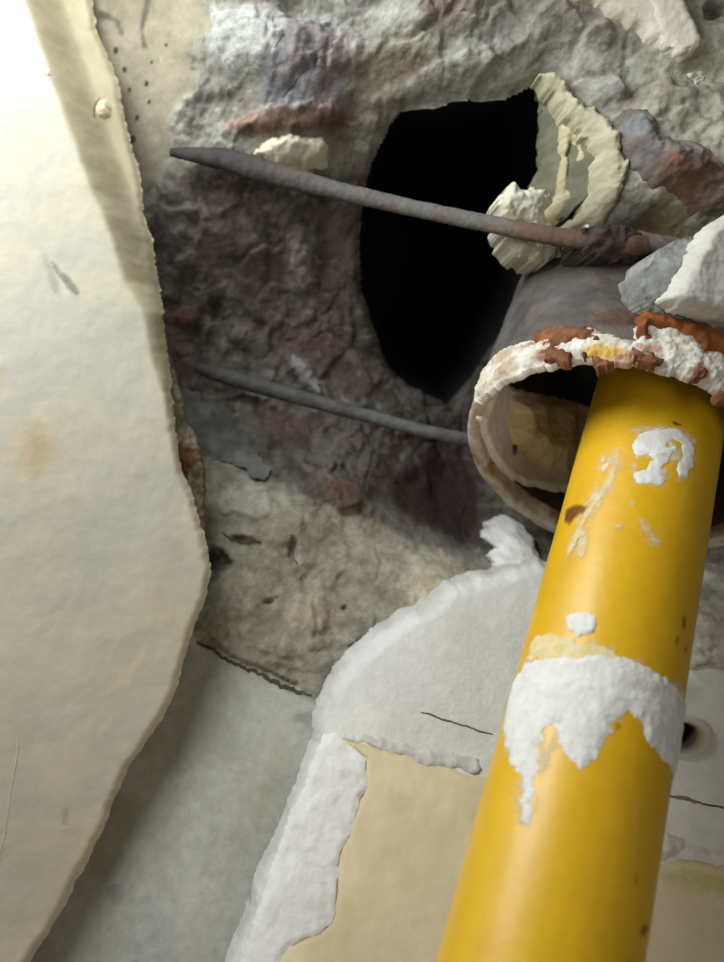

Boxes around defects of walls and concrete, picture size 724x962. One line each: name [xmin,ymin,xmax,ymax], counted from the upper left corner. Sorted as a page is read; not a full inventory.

spalling [142,0,724,562]
rust [532,325,614,377]
rust [632,310,724,372]
rust [689,365,708,384]
rust [710,391,724,408]
spalling [690,545,724,671]
crack [196,642,312,697]
peeling [240,732,482,962]
peeling [661,832,724,861]